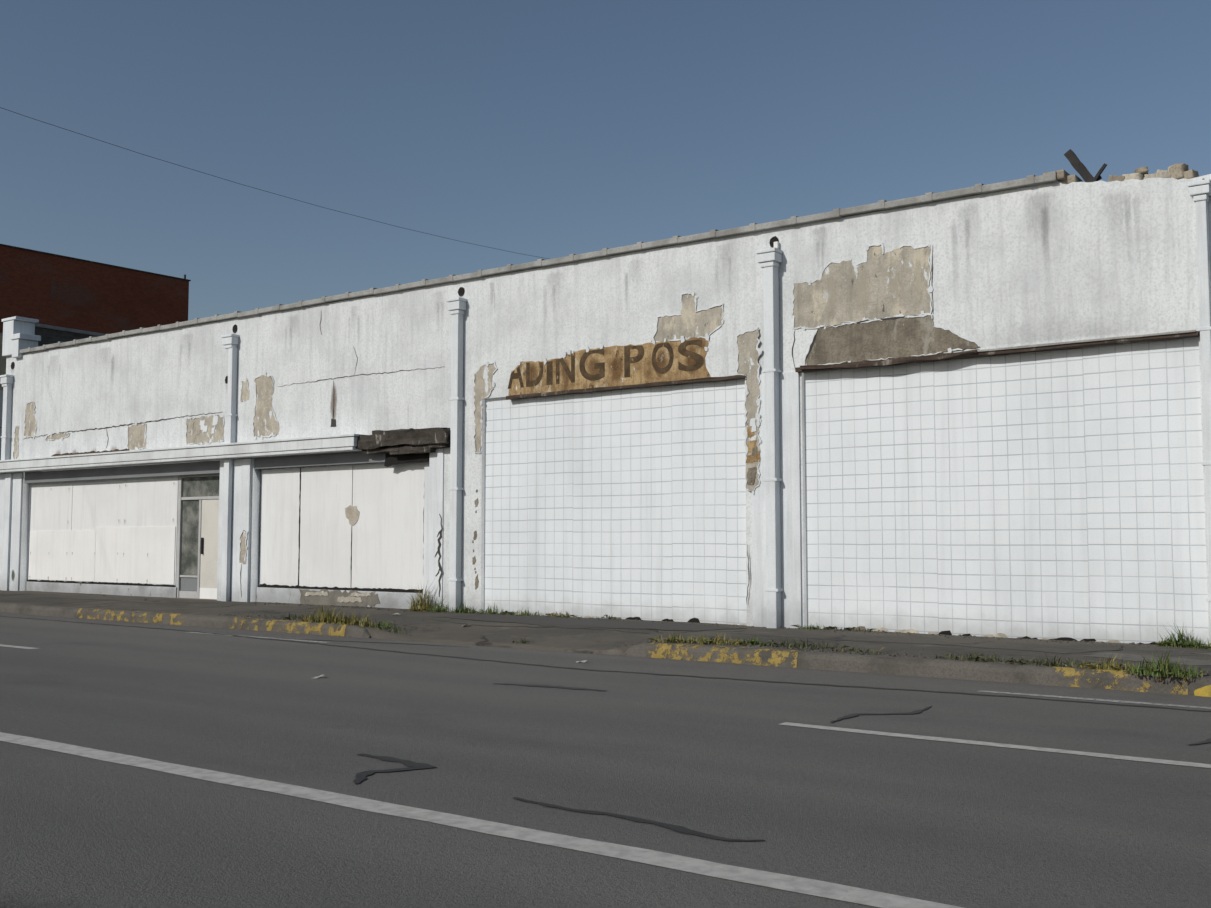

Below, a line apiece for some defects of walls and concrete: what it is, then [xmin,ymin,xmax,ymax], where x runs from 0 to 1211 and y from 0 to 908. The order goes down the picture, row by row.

peeling [791,243,980,367]
peeling [13,402,70,459]
peeling [127,423,147,450]
peeling [185,414,225,445]
peeling [240,372,279,440]
peeling [473,292,724,454]
peeling [736,327,762,495]
peeling [345,505,359,526]
crack [435,514,443,597]